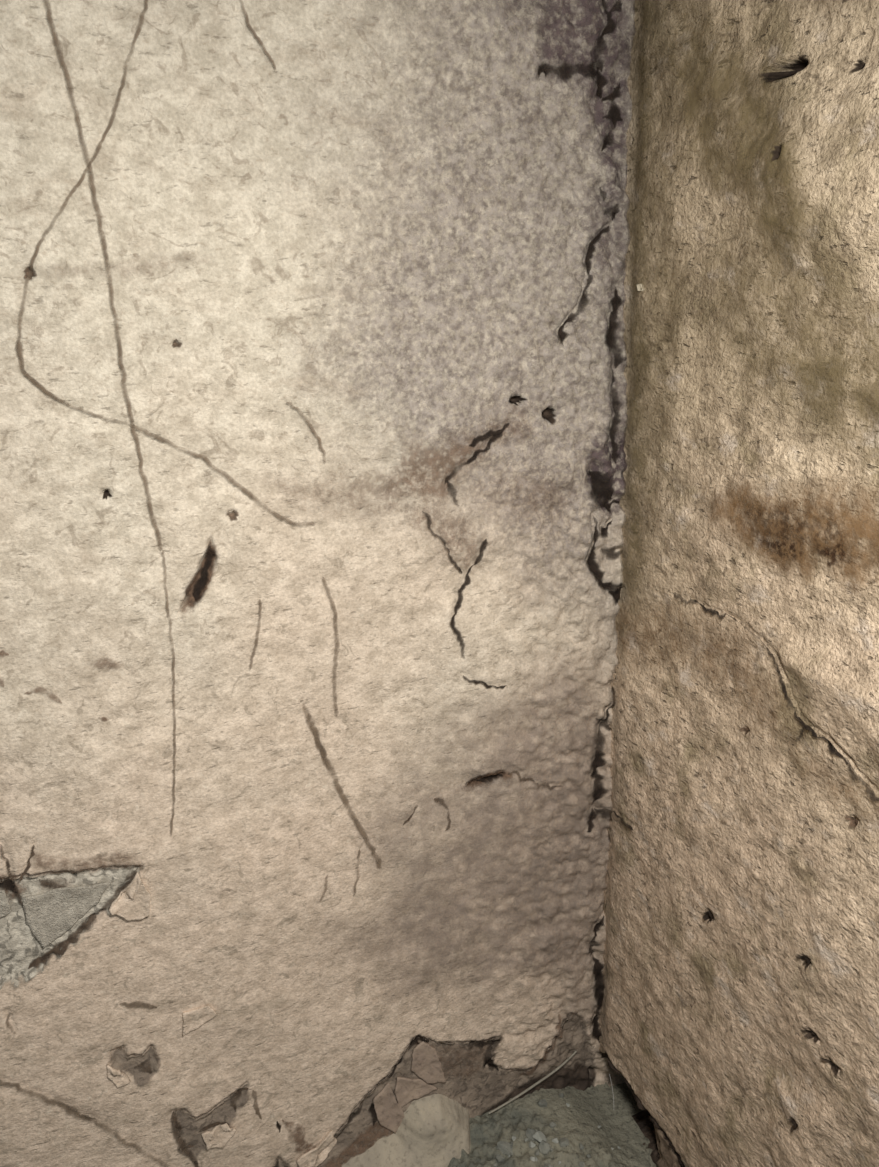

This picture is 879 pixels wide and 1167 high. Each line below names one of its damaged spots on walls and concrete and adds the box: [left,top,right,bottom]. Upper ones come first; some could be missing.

crack [538,0,623,151]
water stain [679,13,803,235]
crack [422,511,506,688]
crack [445,423,510,499]
crack [558,187,624,603]
water stain [714,490,879,577]
crack [587,677,634,840]
crack [672,592,879,801]
flaking render [0,867,151,990]
flaking render [107,1047,160,1088]
flaking render [171,1084,262,1167]
peeling [275,1015,685,1167]